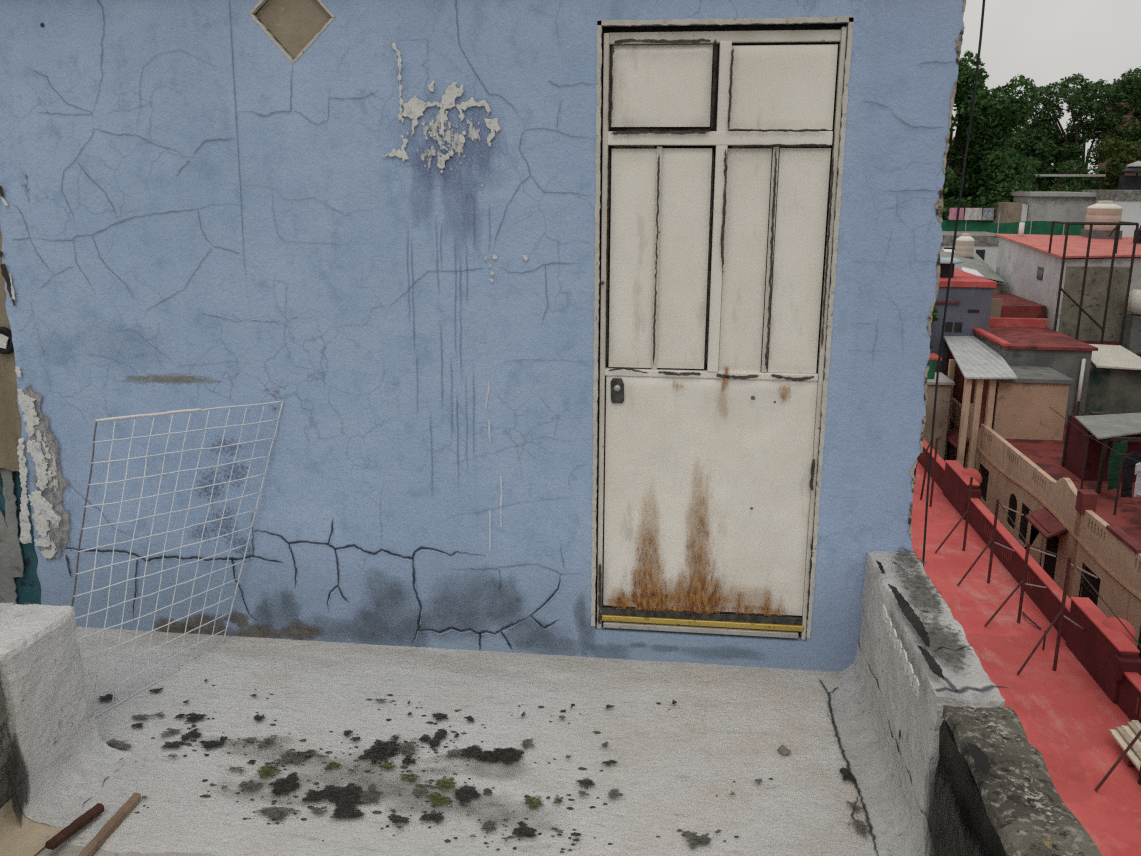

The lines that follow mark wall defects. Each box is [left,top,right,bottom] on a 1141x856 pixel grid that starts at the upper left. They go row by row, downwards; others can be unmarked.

peeling [381,43,501,183]
flaking render [15,366,71,560]
crack [66,514,561,650]
rust [608,518,786,616]
crack [819,679,879,856]